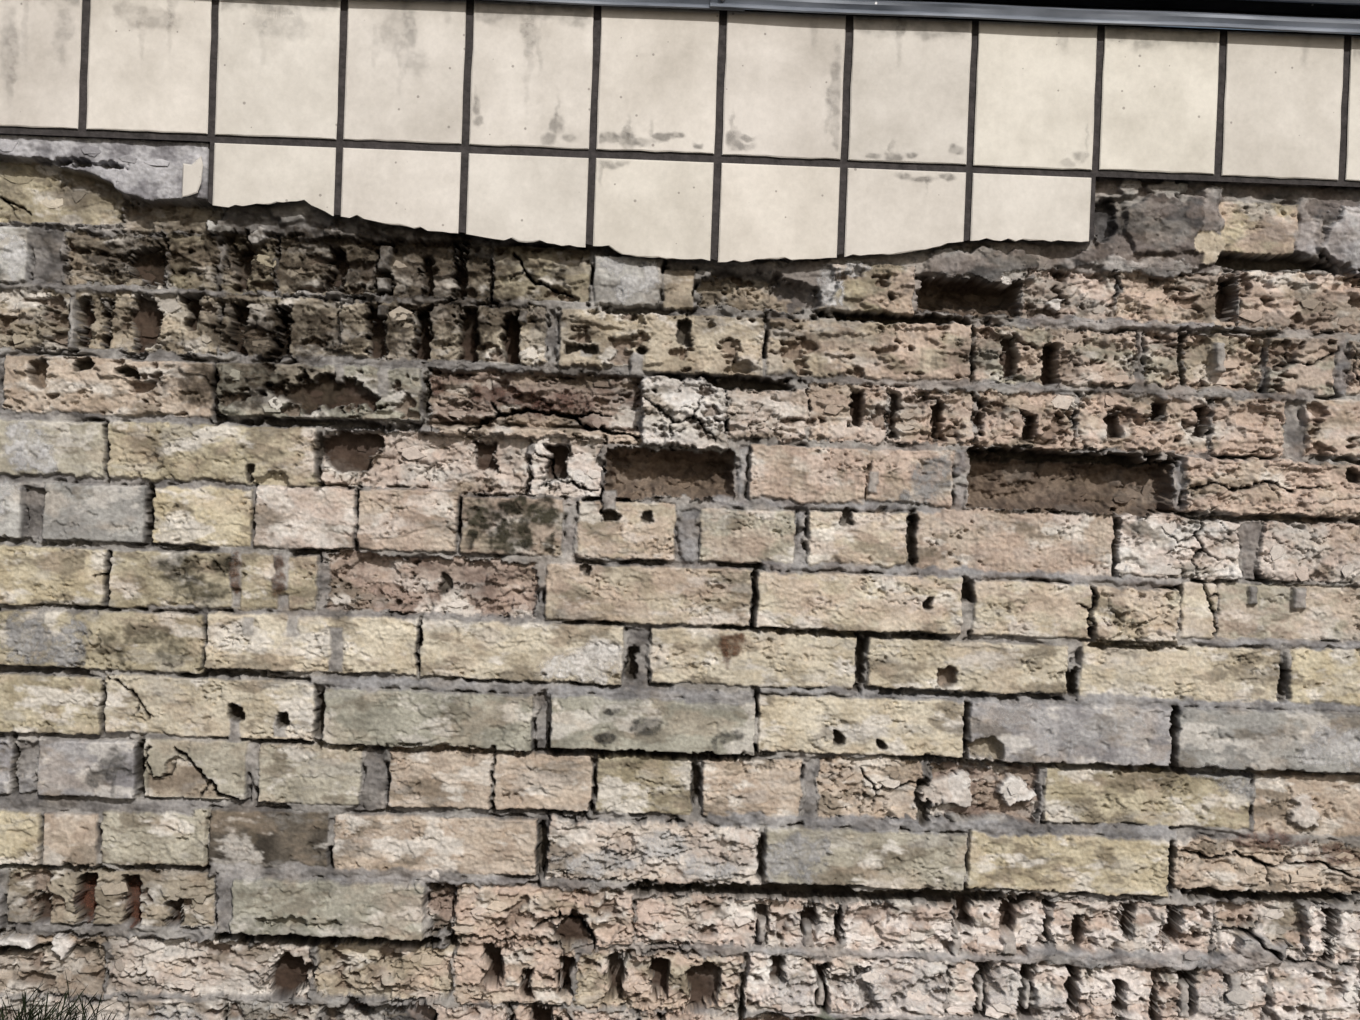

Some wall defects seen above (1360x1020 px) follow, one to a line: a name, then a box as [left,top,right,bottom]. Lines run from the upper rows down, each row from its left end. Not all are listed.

spalling [0,134,736,504]
crack [1170,481,1319,634]
crack [117,679,239,799]
peeling [0,836,1360,1020]
crack [1184,849,1351,881]